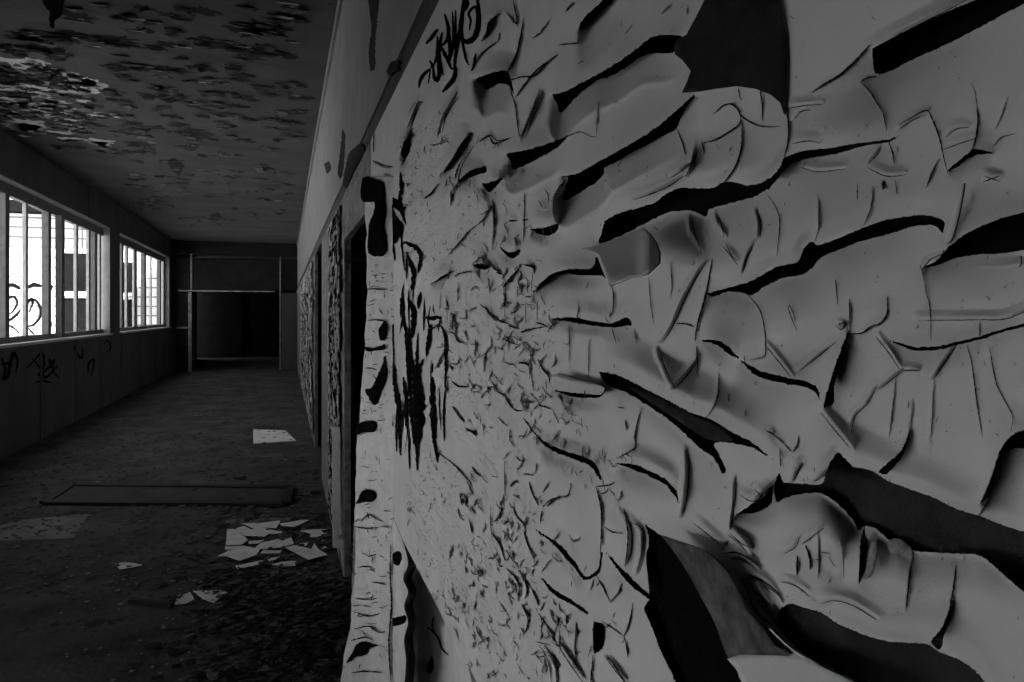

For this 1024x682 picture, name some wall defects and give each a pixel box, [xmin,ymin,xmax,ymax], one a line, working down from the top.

peeling [0,0,315,227]
peeling [324,129,366,188]
peeling [441,0,1024,297]
peeling [328,207,339,555]
peeling [364,321,388,405]
crack [343,88,816,682]
peeling [533,296,1024,682]